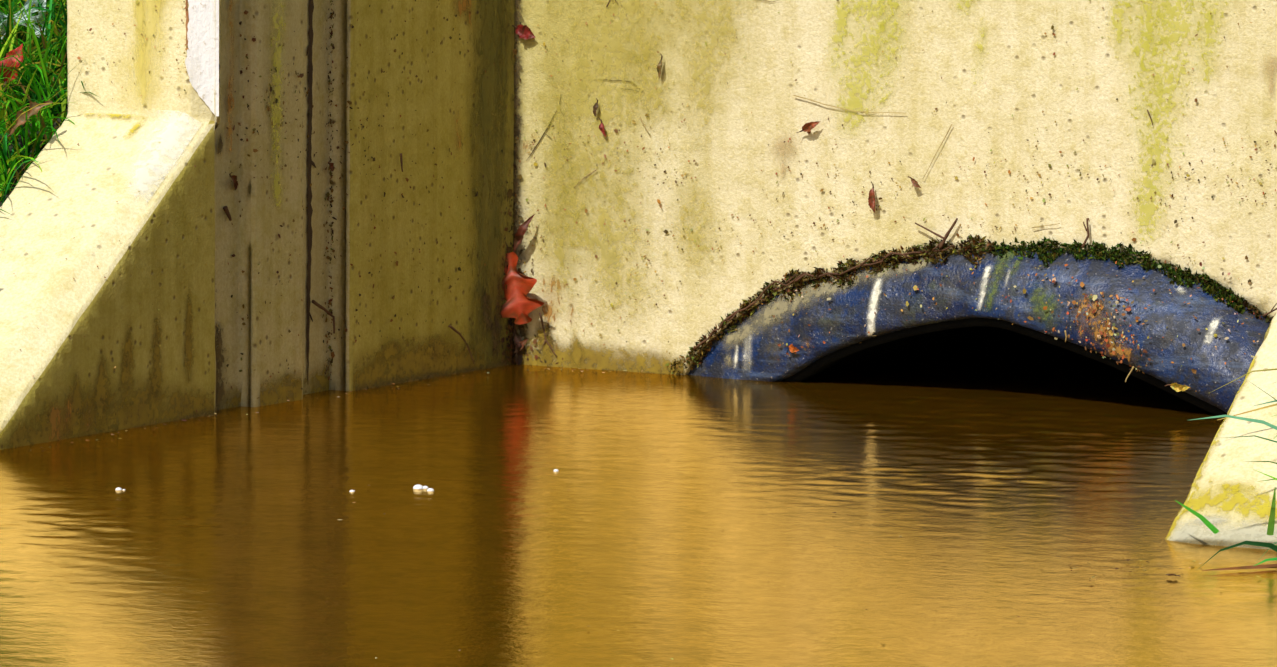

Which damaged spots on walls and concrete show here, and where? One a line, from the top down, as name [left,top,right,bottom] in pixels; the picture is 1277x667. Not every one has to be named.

water stain [831,0,849,67]
water stain [1111,0,1163,109]
water stain [1197,0,1227,83]
water stain [184,295,193,382]